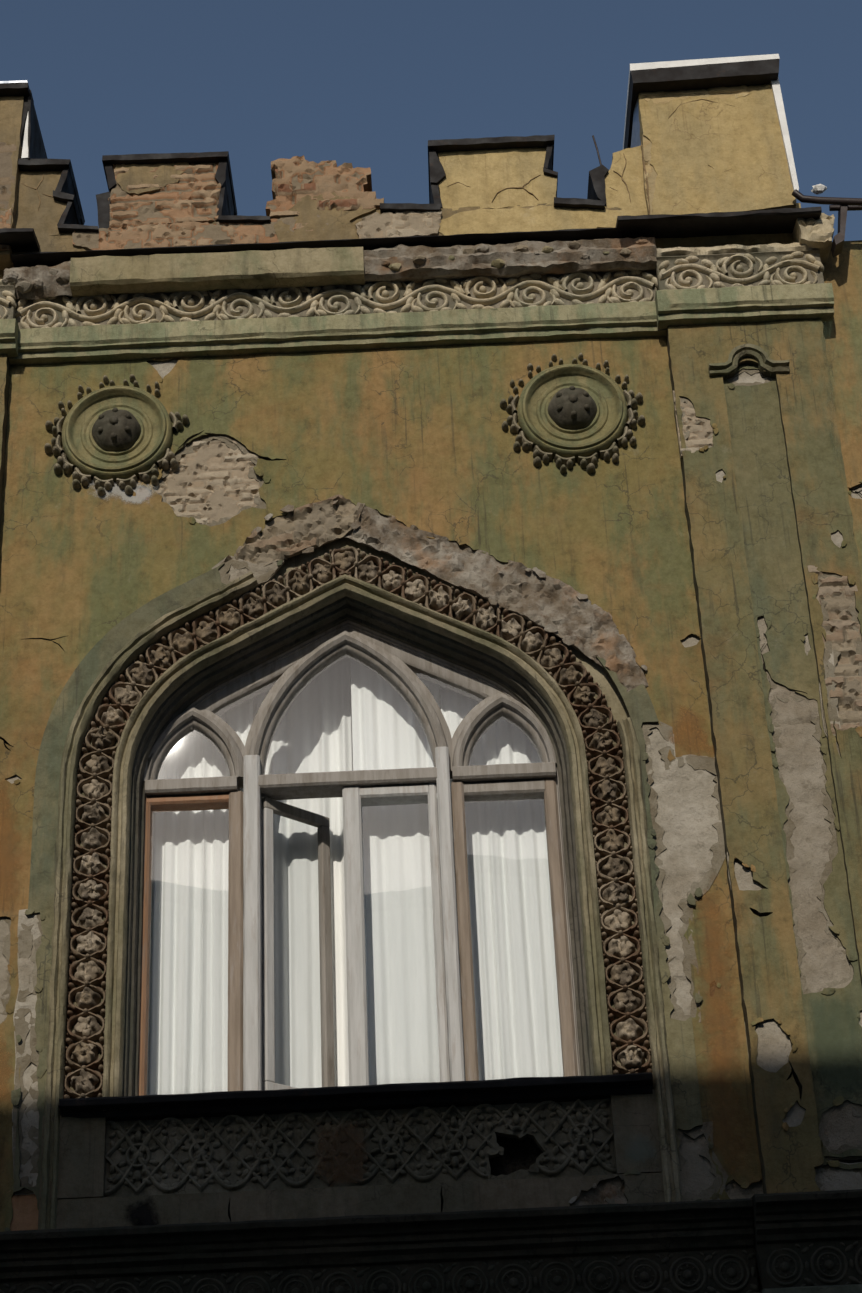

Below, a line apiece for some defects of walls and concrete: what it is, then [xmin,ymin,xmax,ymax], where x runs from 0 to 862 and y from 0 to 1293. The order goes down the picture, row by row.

flaking render [0,142,17,251]
crack [447,175,540,202]
flaking render [672,390,718,459]
flaking render [132,435,365,586]
peeling [544,624,574,646]
peeling [757,565,862,995]
peeling [641,721,764,1022]
peeling [0,909,47,1231]
flaking render [750,1017,798,1072]
spalling [487,1129,541,1176]
flaking render [815,1096,862,1191]